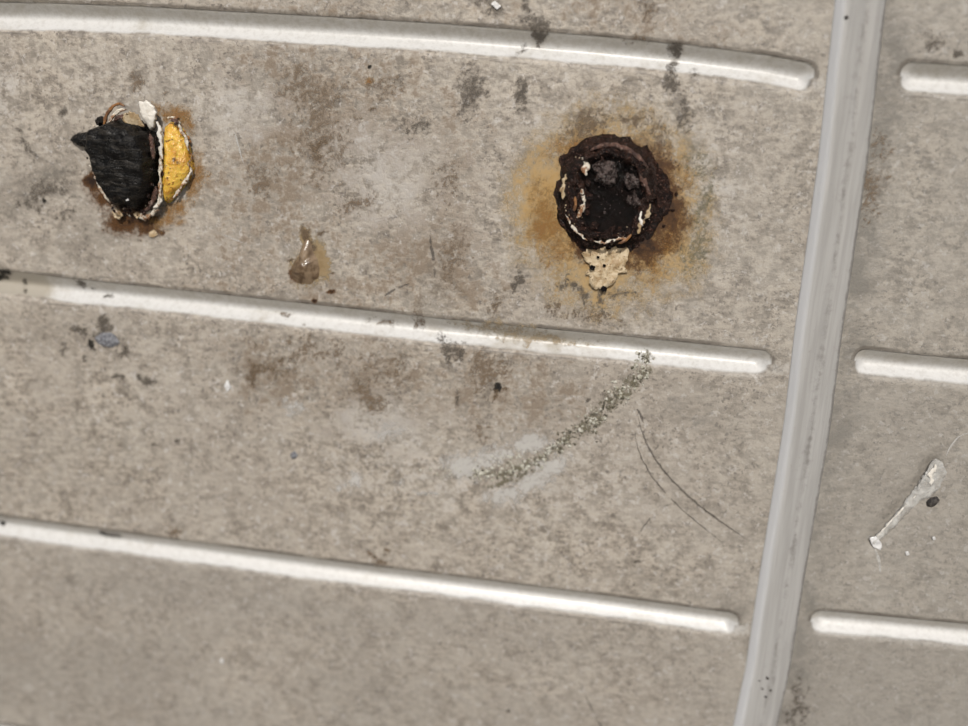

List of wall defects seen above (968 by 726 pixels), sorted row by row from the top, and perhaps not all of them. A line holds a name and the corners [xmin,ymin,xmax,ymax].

rust [154,105,194,132]
rust [82,155,209,236]
rust [502,104,712,322]
crack [635,409,749,541]